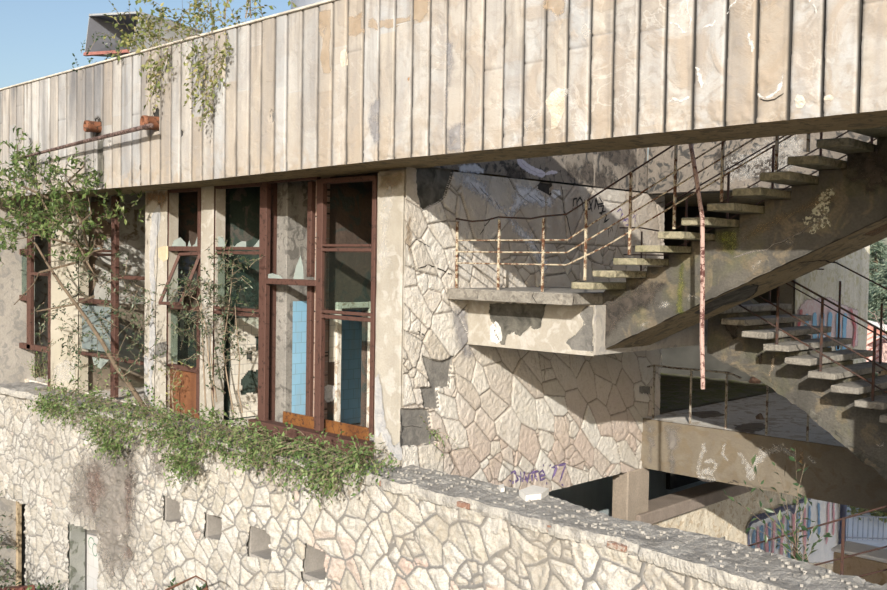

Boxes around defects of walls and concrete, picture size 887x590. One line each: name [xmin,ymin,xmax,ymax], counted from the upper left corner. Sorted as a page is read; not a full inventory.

spalling [489,302,546,345]
spalling [566,306,594,353]
leakage [71,452,136,574]